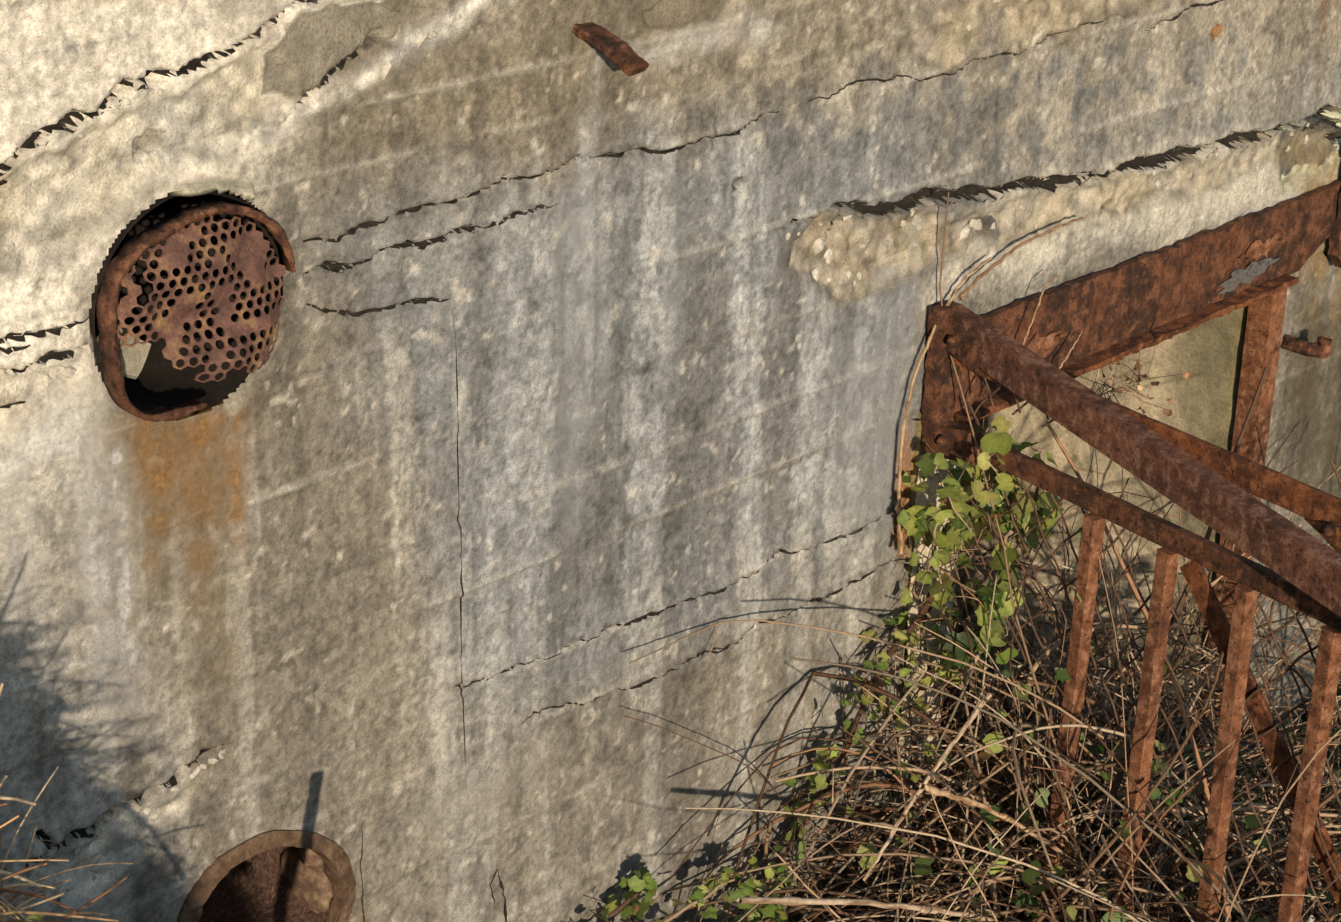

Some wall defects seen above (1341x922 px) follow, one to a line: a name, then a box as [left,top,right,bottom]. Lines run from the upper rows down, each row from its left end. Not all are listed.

crack [0,0,318,186]
crack [294,46,360,104]
crack [809,0,1223,101]
crack [786,104,1341,241]
spalling [788,108,1341,303]
crack [0,317,89,408]
crack [303,111,904,786]
crack [23,744,226,878]